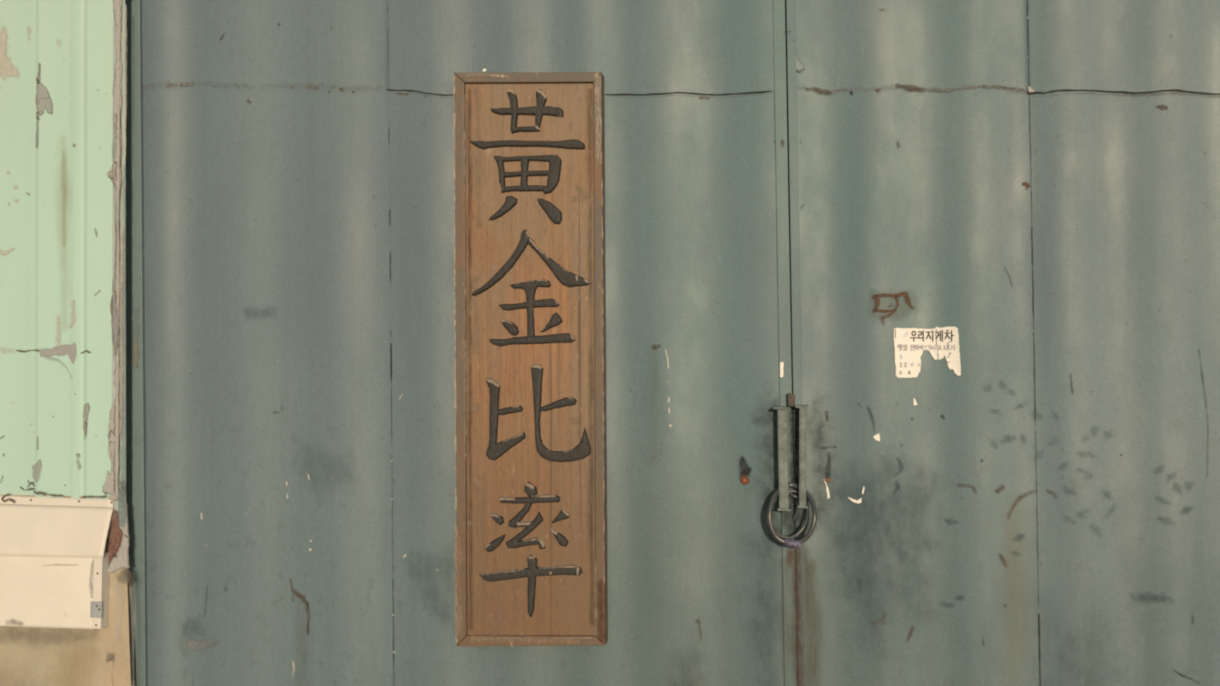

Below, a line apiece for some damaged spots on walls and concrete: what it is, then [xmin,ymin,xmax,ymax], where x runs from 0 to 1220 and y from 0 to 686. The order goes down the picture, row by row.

peeling [36,64,52,133]
peeling [82,0,129,573]
rust [872,292,914,319]
peeling [20,437,66,497]
rust [740,457,751,485]